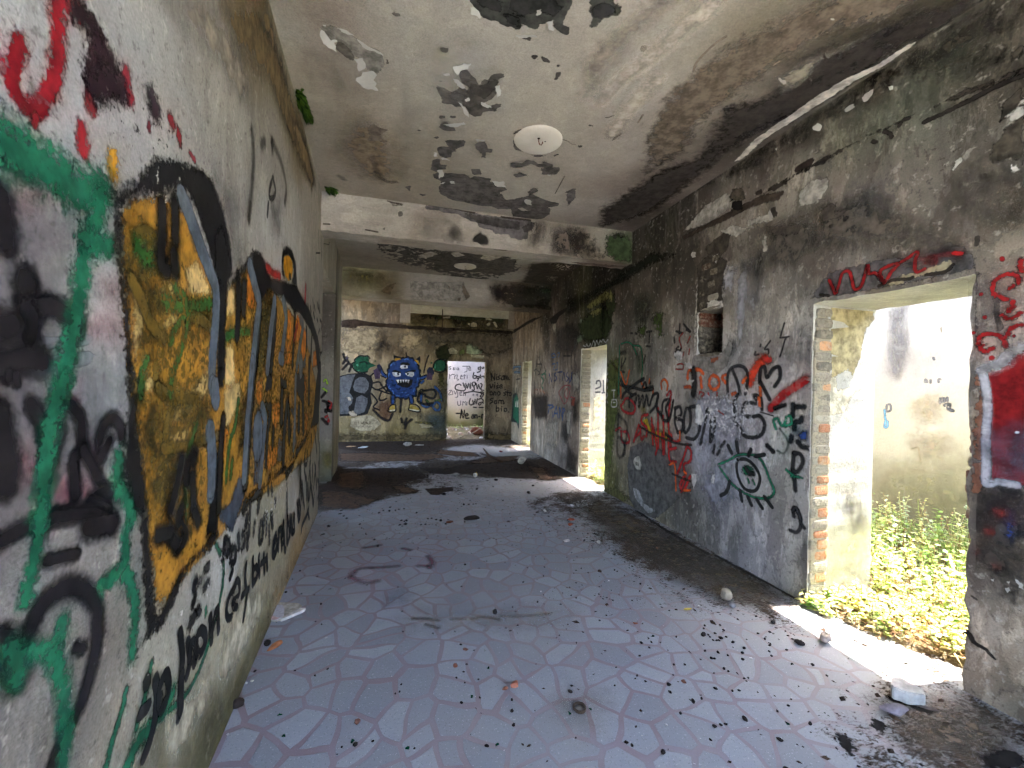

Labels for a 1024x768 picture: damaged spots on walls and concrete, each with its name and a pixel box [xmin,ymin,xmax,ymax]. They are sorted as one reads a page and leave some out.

peeling [320,25,389,91]
flaking render [470,0,572,41]
damp [584,0,670,97]
peeling [405,63,576,240]
damp [598,0,1024,240]
flaking render [799,178,828,207]
peeling [378,244,524,279]
damp [584,251,676,300]
flaking render [674,181,787,383]
damp [723,198,963,338]
peeling [695,389,764,439]
flaking render [970,374,983,494]